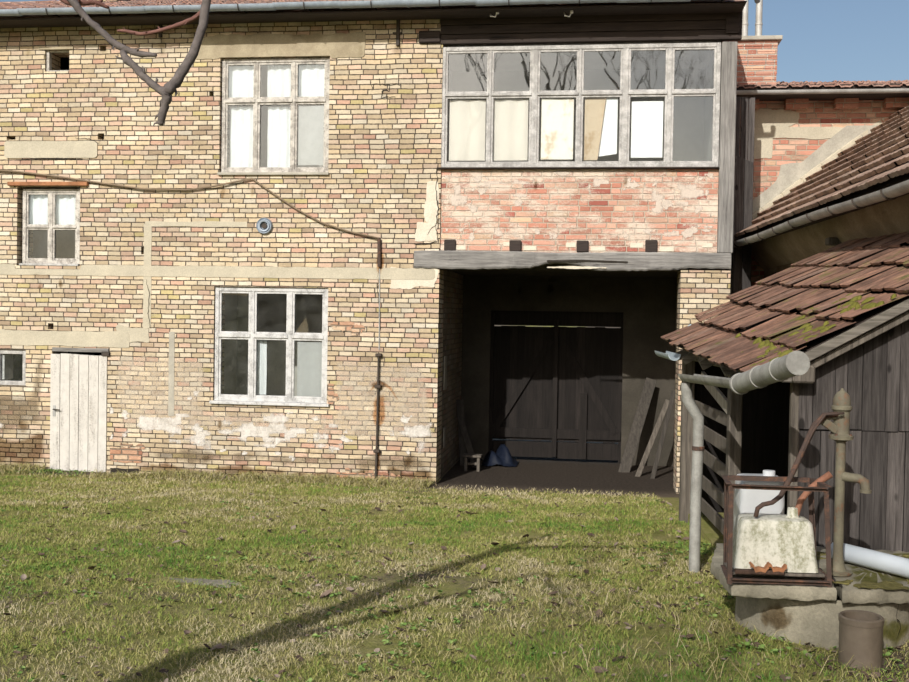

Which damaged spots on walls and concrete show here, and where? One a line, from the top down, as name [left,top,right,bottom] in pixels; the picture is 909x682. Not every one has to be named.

flaking render [445,175,530,218]
flaking render [587,179,609,194]
flaking render [651,173,714,214]
flaking render [643,224,713,239]